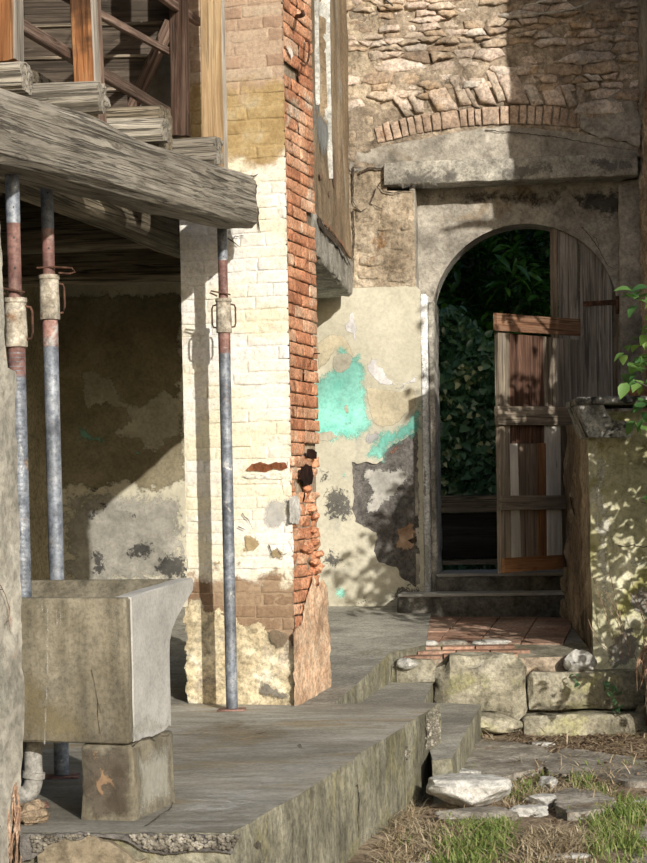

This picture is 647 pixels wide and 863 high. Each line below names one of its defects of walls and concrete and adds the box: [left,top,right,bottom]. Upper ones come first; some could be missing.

flaking render [243,449,317,493]
flaking render [315,312,429,586]
leakage [63,488,187,580]
peeling [244,535,259,552]
spalling [300,505,325,573]
flaking render [270,629,289,648]
flaking render [261,683,289,699]